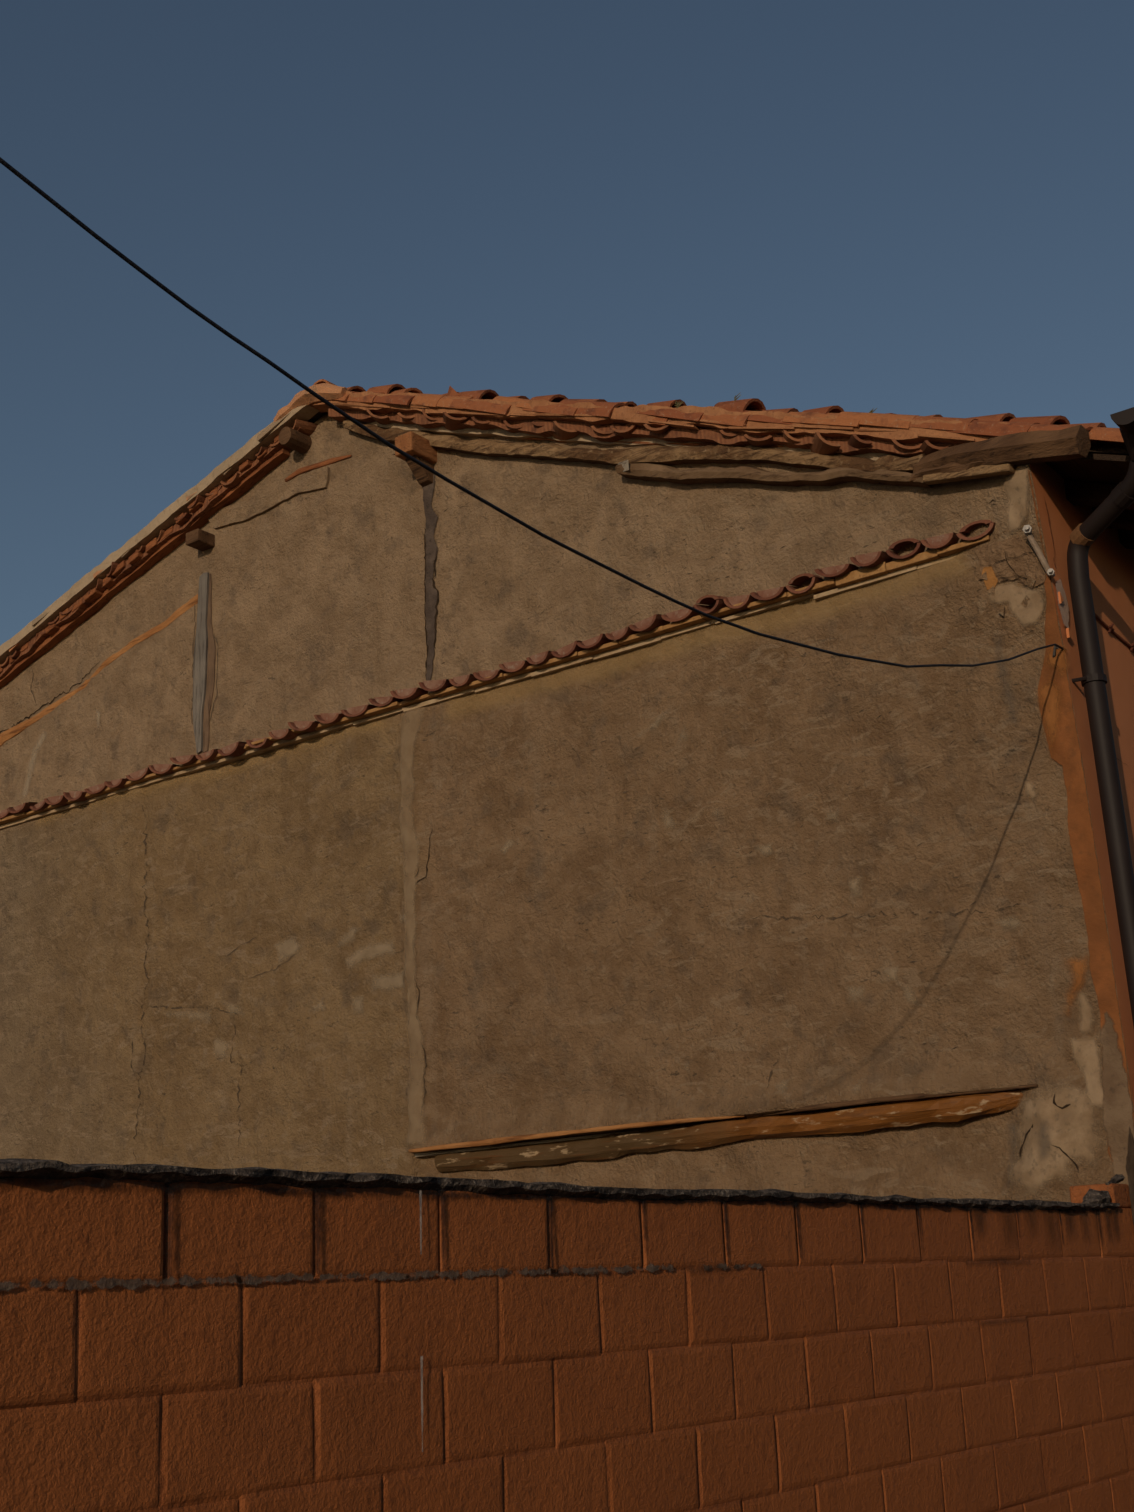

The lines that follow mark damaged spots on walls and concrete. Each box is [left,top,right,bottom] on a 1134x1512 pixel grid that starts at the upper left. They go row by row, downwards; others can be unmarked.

crack [130,808,242,1157]
water stain [629,1198,1118,1263]